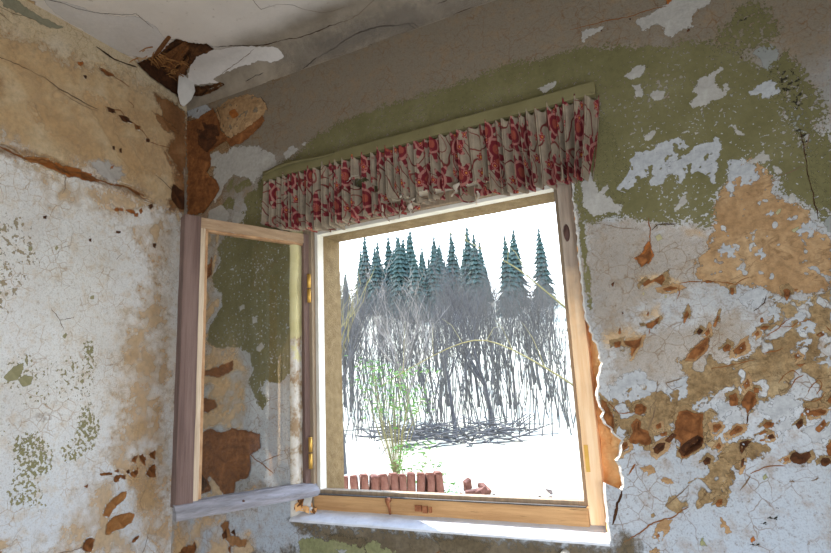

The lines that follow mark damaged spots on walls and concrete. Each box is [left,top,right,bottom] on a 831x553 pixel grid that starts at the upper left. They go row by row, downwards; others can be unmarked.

crack [170,0,374,47]
flaking render [45,0,284,107]
crack [0,47,171,148]
peeling [186,0,831,509]
crack [711,317,831,369]
peeling [1,341,100,512]
spalling [103,491,135,535]
spalling [100,451,156,483]
crack [612,464,636,525]
crack [625,485,689,542]
spalling [649,495,688,553]
crack [740,465,818,490]